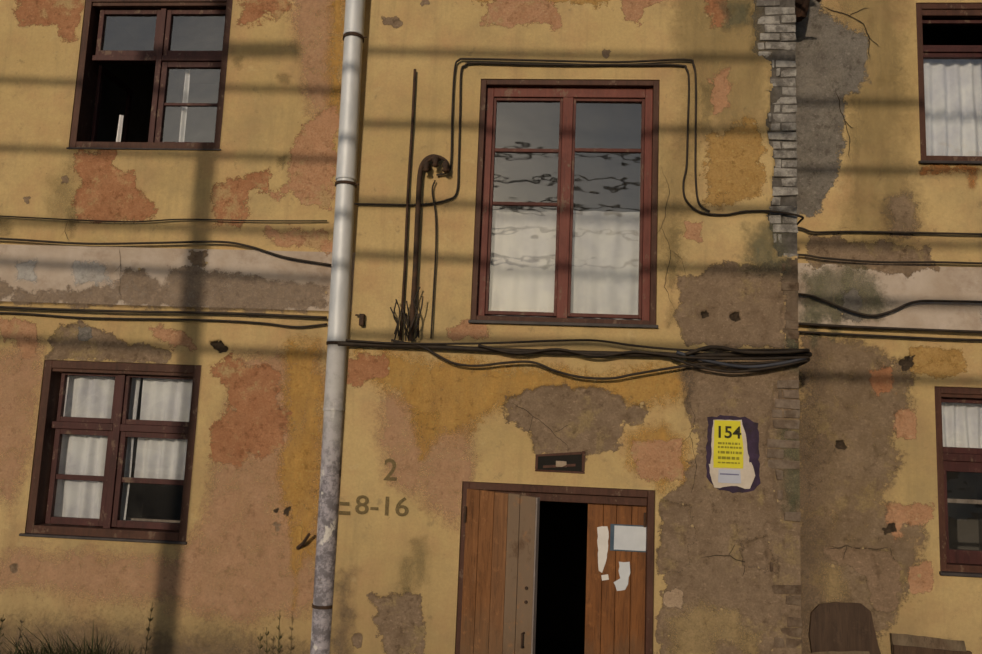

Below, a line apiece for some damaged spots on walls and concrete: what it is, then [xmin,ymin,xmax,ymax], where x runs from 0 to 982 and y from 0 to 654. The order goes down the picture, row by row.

peeling [12,0,84,42]
peeling [61,149,157,225]
peeling [210,104,339,228]
peeling [0,250,329,364]
flaking render [654,0,967,654]
peeling [209,353,293,471]
flaking render [502,381,649,461]
crack [701,545,745,574]
flaking render [366,591,427,654]